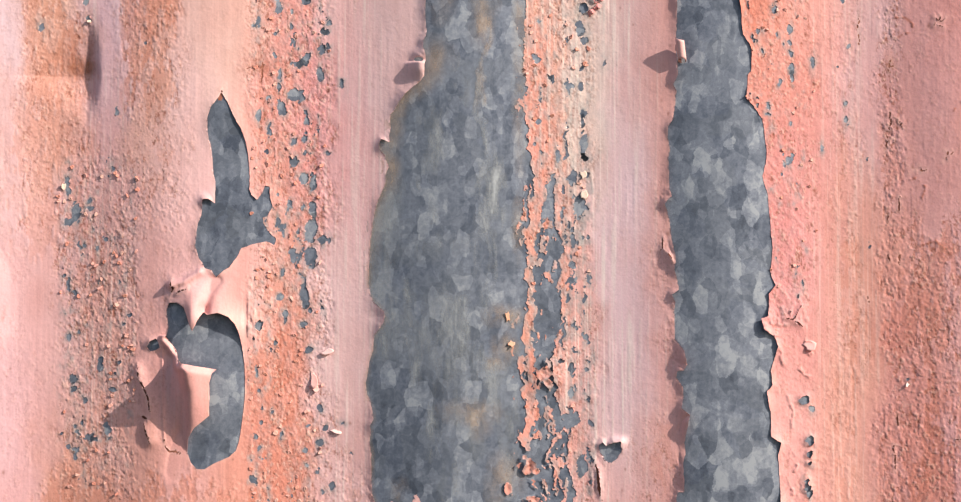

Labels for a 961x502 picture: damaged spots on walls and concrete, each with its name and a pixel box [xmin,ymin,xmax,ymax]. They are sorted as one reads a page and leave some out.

spalling [195,0,332,288]
spalling [59,197,137,298]
peeling [366,0,628,502]
peeling [665,0,807,502]
peeling [60,373,112,462]
peeling [97,313,135,408]
spalling [147,300,268,469]
spalling [249,406,309,502]
peeling [258,293,324,337]
peeling [300,373,324,412]
peeling [302,422,344,474]
peeling [805,435,814,465]